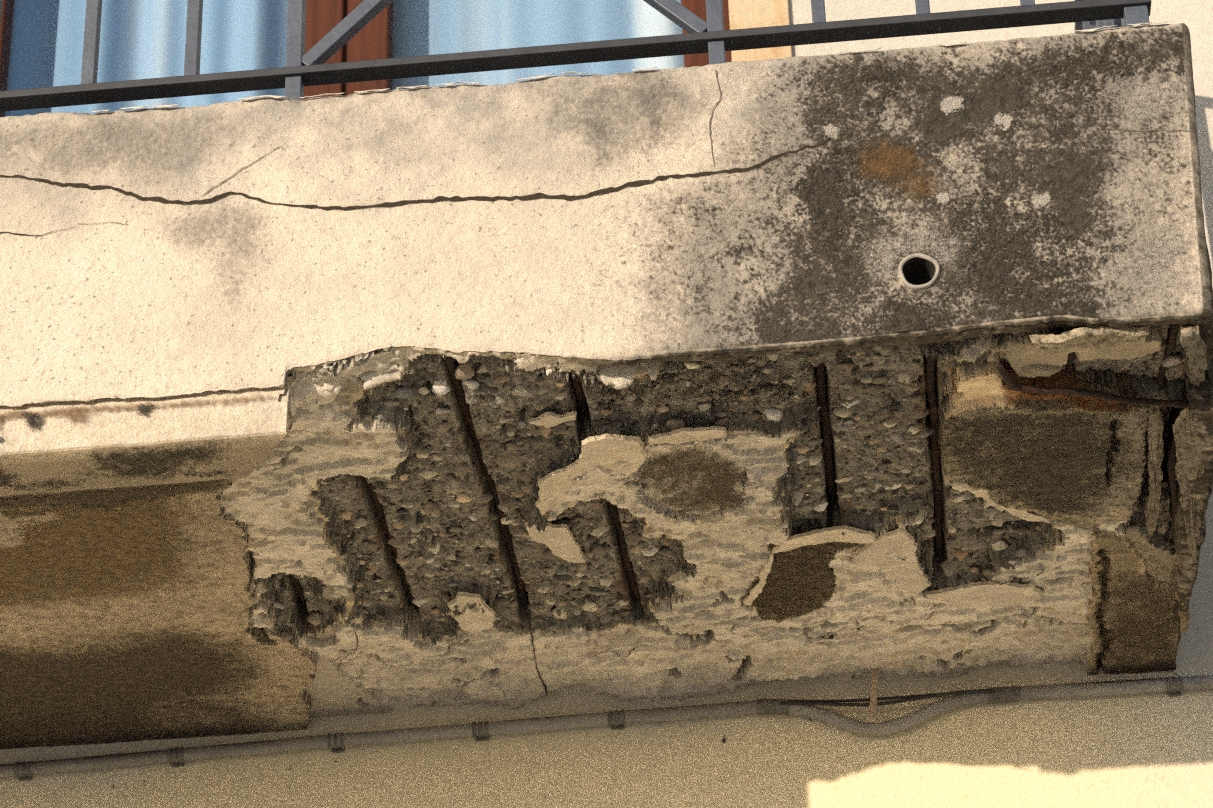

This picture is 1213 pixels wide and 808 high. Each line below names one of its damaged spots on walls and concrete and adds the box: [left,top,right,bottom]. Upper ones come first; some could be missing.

crack [0,70,843,236]
leakage [600,78,676,137]
leakage [639,26,1190,360]
leakage [0,441,237,606]
leakage [0,396,270,442]
leakage [627,445,749,519]
leakage [569,361,809,409]
flaking render [220,324,1207,718]
mould [938,406,1144,518]
corrosion [1001,361,1135,412]
leakage [742,542,852,620]
leakage [0,630,263,749]